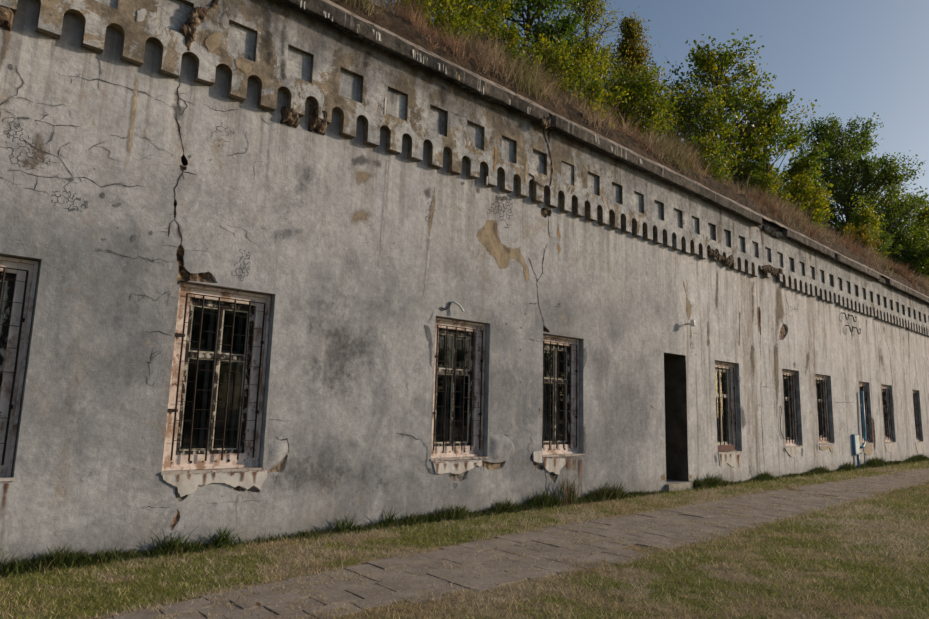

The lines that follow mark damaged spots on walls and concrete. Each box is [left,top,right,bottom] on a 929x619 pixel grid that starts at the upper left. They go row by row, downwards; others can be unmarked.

spalling [0,5,14,31]
peeling [137,8,147,22]
spalling [179,0,224,53]
spalling [280,105,327,136]
crack [0,62,274,266]
crack [219,224,254,278]
peeling [476,220,529,281]
crack [144,331,169,387]
flaking render [162,455,288,531]
flaking render [429,460,506,488]
flaking render [530,451,566,484]